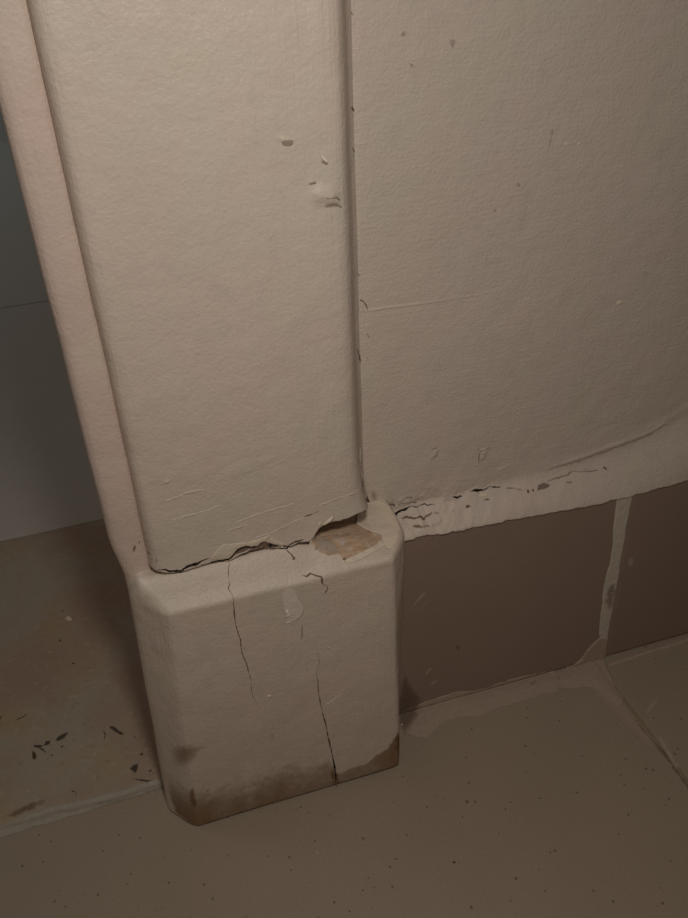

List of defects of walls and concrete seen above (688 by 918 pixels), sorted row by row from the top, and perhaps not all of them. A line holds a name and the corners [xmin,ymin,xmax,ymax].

peeling [309,502,422,563]
crack [390,496,444,526]
crack [454,486,521,508]
crack [552,467,607,483]
crack [147,535,328,701]
crack [317,656,337,780]